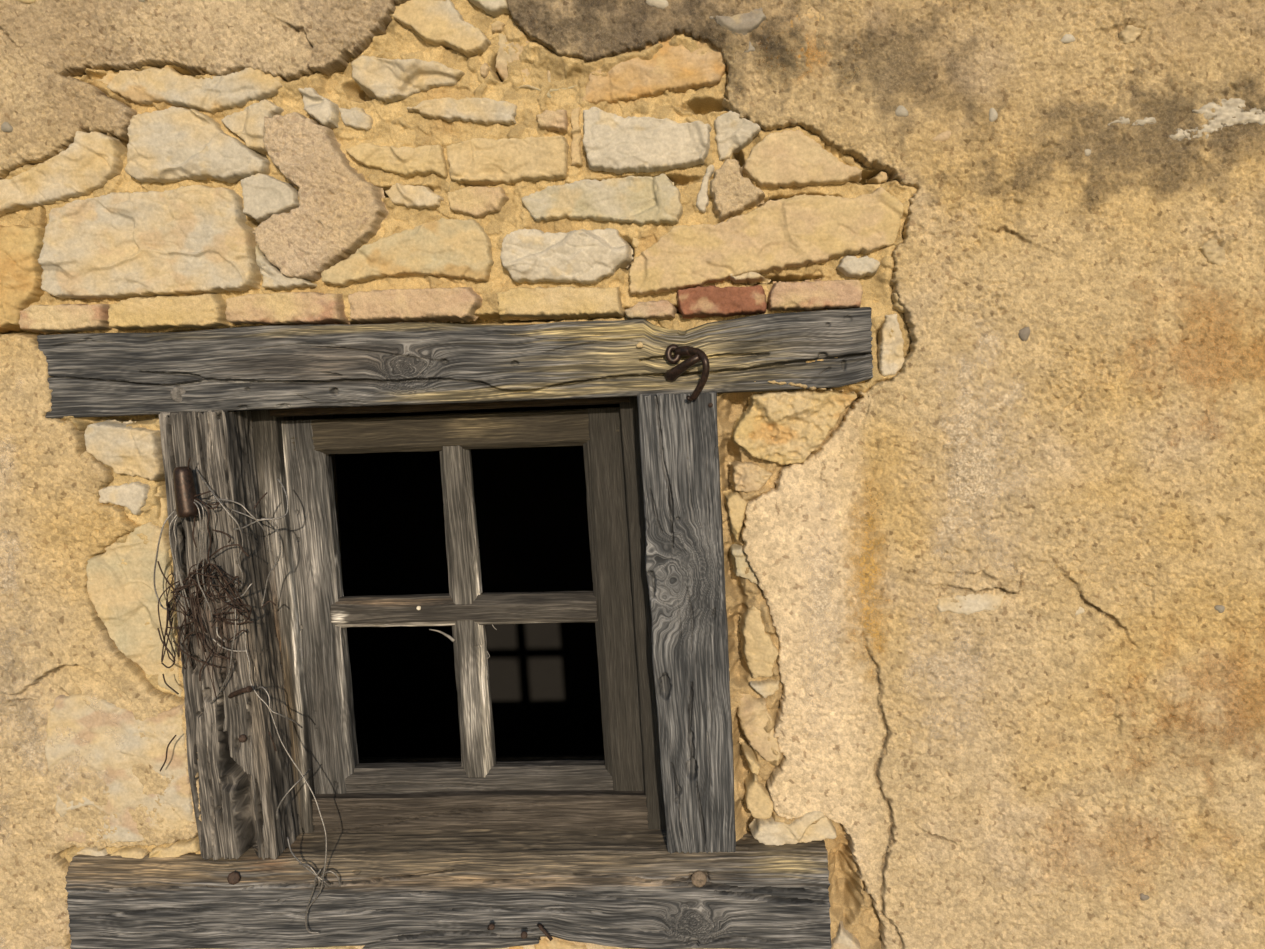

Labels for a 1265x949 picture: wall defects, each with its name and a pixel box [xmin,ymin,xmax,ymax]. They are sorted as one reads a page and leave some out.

flaking render [1107,116,1156,126]
flaking render [1167,98,1265,141]
flaking render [0,0,917,949]